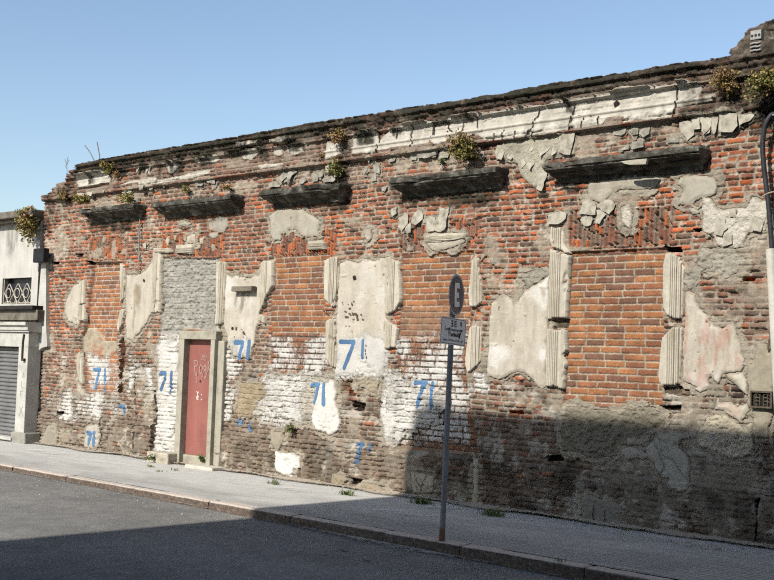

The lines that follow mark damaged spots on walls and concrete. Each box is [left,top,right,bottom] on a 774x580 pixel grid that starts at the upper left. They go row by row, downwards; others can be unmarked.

flaking render [70,79,757,199]
flaking render [165,216,230,250]
flaking render [267,206,325,245]
flaking render [389,204,472,257]
flaking render [63,280,83,329]
peeling [121,240,179,452]
flaking render [220,250,571,450]
flaking render [544,166,774,468]
peeling [46,352,120,423]